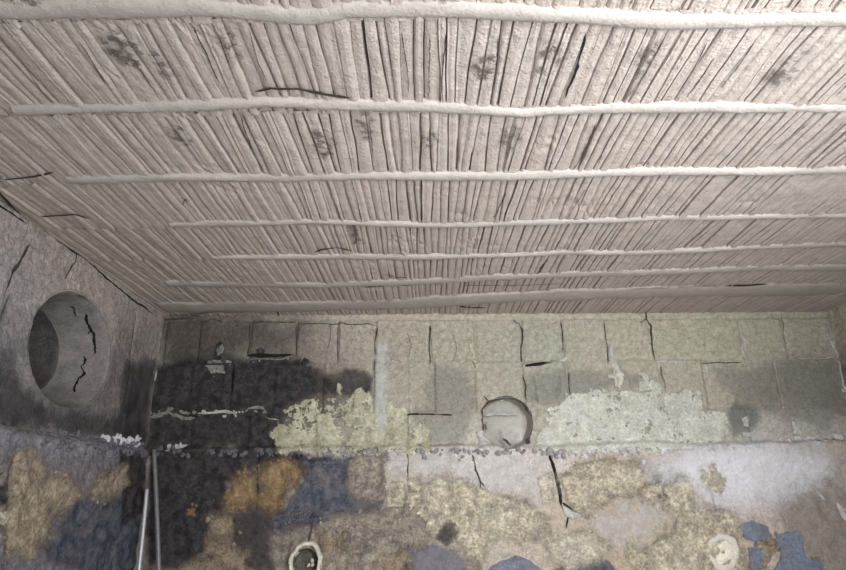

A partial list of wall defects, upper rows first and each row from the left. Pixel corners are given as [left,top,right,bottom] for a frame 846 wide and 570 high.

crack [0,172,89,289]
crack [70,306,96,393]
crack [56,239,229,365]
crack [481,321,571,430]
crack [472,454,485,488]
crack [549,455,582,528]